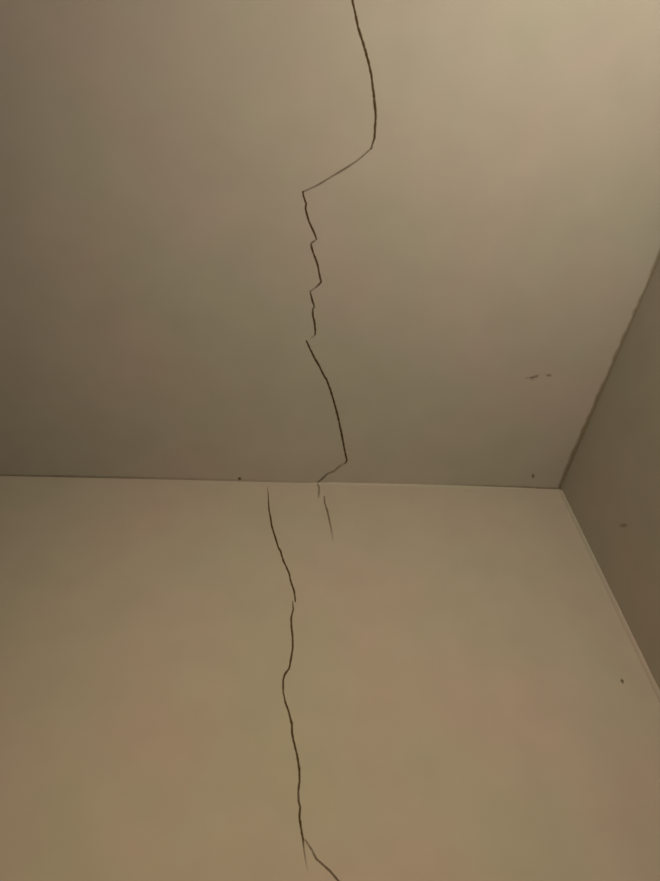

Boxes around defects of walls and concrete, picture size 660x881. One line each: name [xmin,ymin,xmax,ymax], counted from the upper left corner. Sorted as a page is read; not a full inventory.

crack [352,0,377,149]
crack [302,191,348,463]
crack [268,497,339,881]